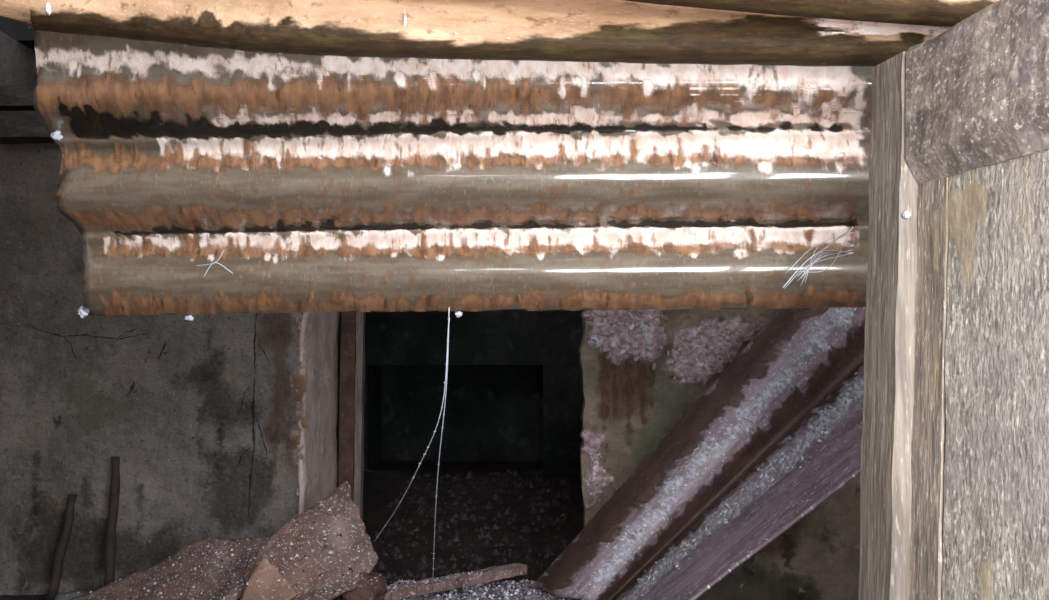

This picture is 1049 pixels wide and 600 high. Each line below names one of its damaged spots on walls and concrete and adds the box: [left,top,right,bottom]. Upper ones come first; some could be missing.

corrosion [37,73,741,126]
corrosion [754,89,793,110]
corrosion [808,90,849,115]
corrosion [60,139,857,173]
crack [233,313,270,517]
corrosion [100,286,859,502]